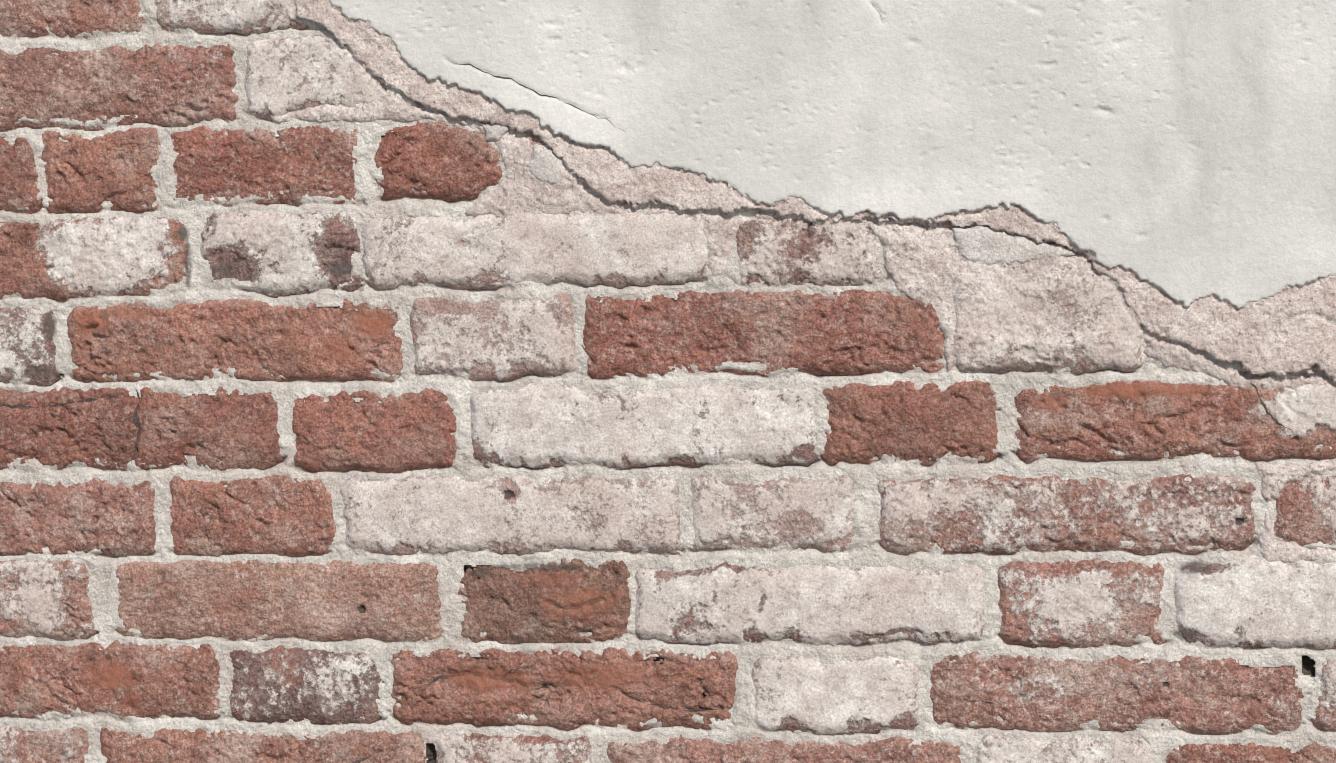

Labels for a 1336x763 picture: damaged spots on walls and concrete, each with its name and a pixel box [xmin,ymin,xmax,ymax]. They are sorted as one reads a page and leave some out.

crack [454,63,620,129]
spalling [296,0,1336,383]
peeling [200,209,357,296]
peeling [1299,475,1336,545]
spalling [1302,655,1315,677]
spalling [427,743,437,763]